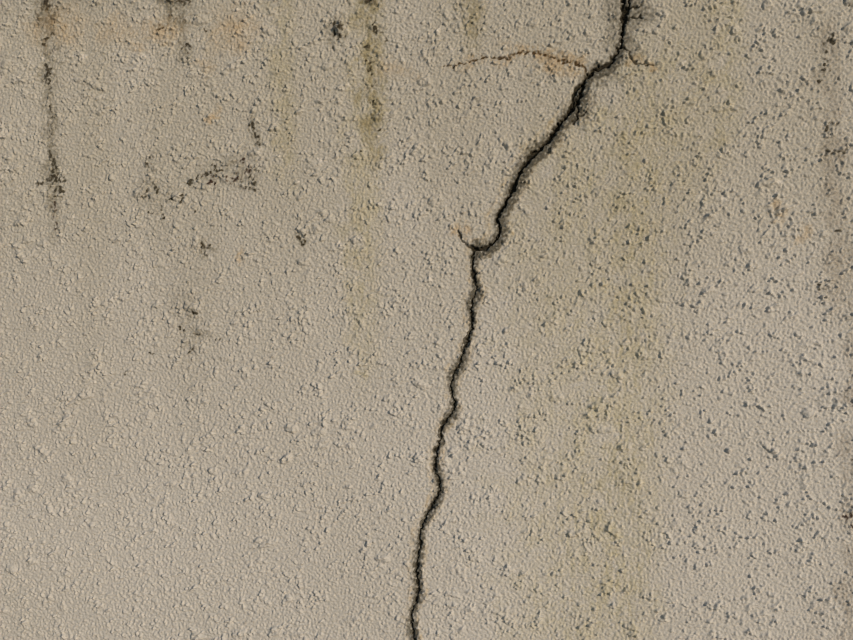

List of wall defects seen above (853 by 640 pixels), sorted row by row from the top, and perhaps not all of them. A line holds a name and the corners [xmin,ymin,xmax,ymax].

crack [408,0,648,640]